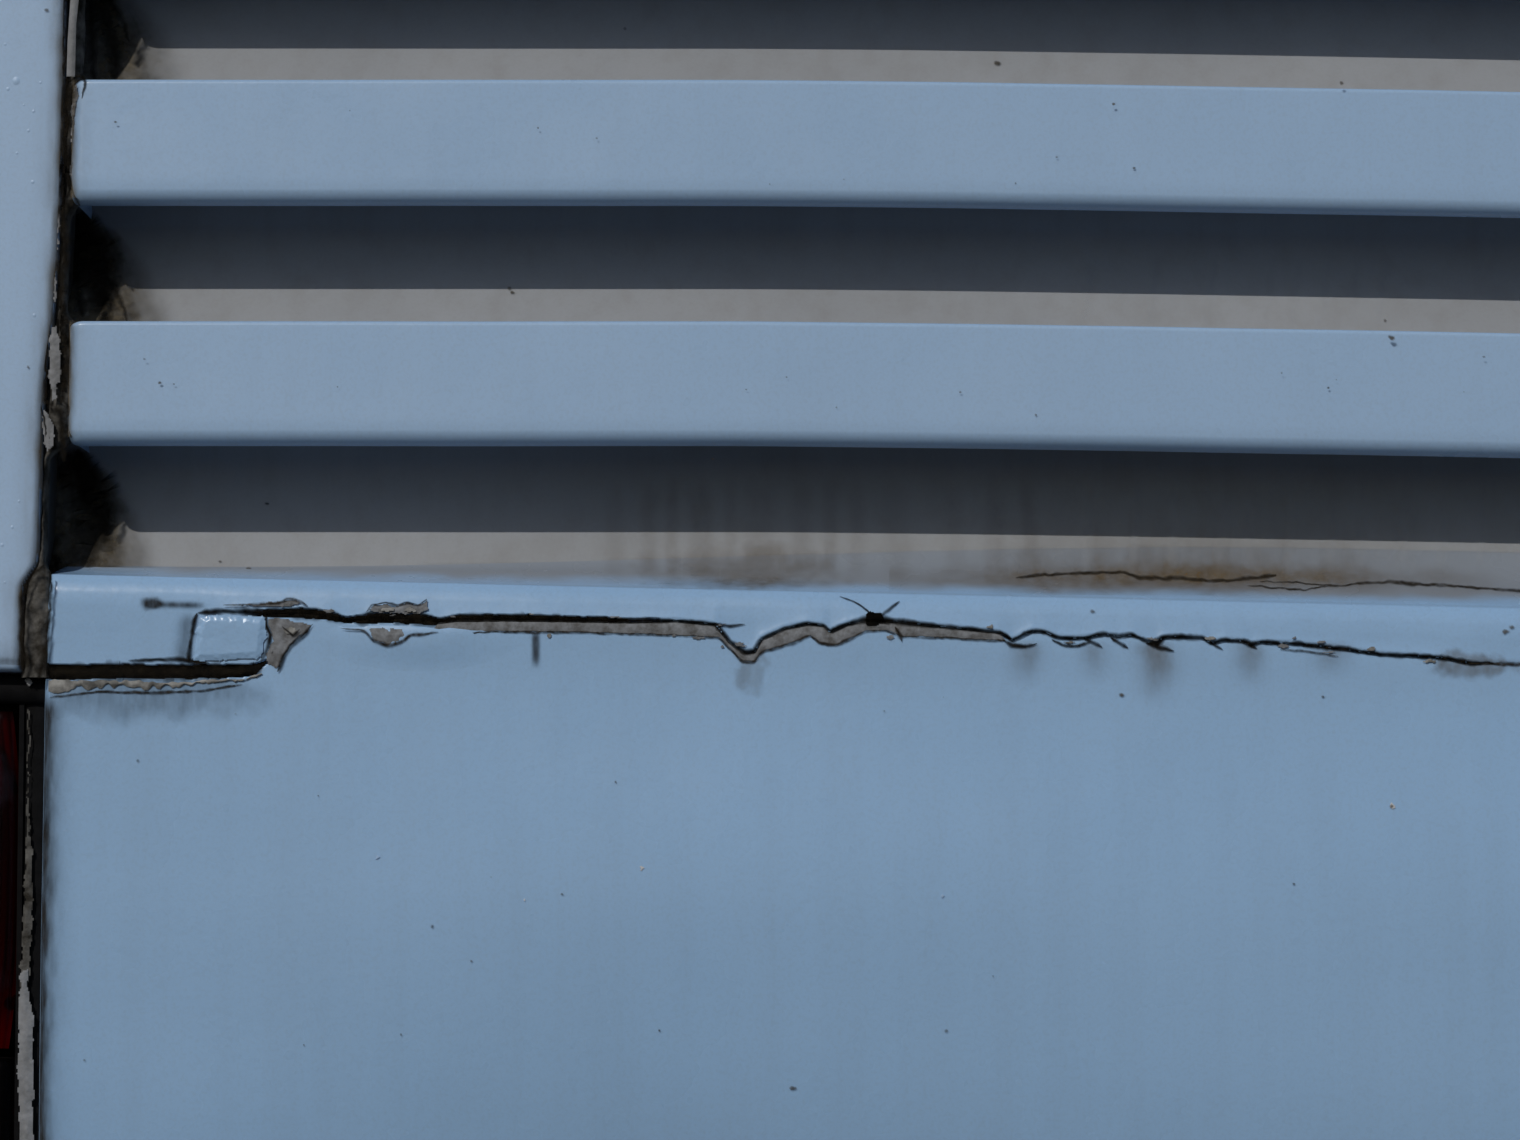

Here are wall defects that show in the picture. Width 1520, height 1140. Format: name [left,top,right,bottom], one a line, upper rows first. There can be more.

damp [48,13,127,357]
damp [18,520,62,665]
spalling [194,598,313,672]
peeling [342,599,436,646]
crack [19,565,1520,698]
peeling [16,709,35,1140]